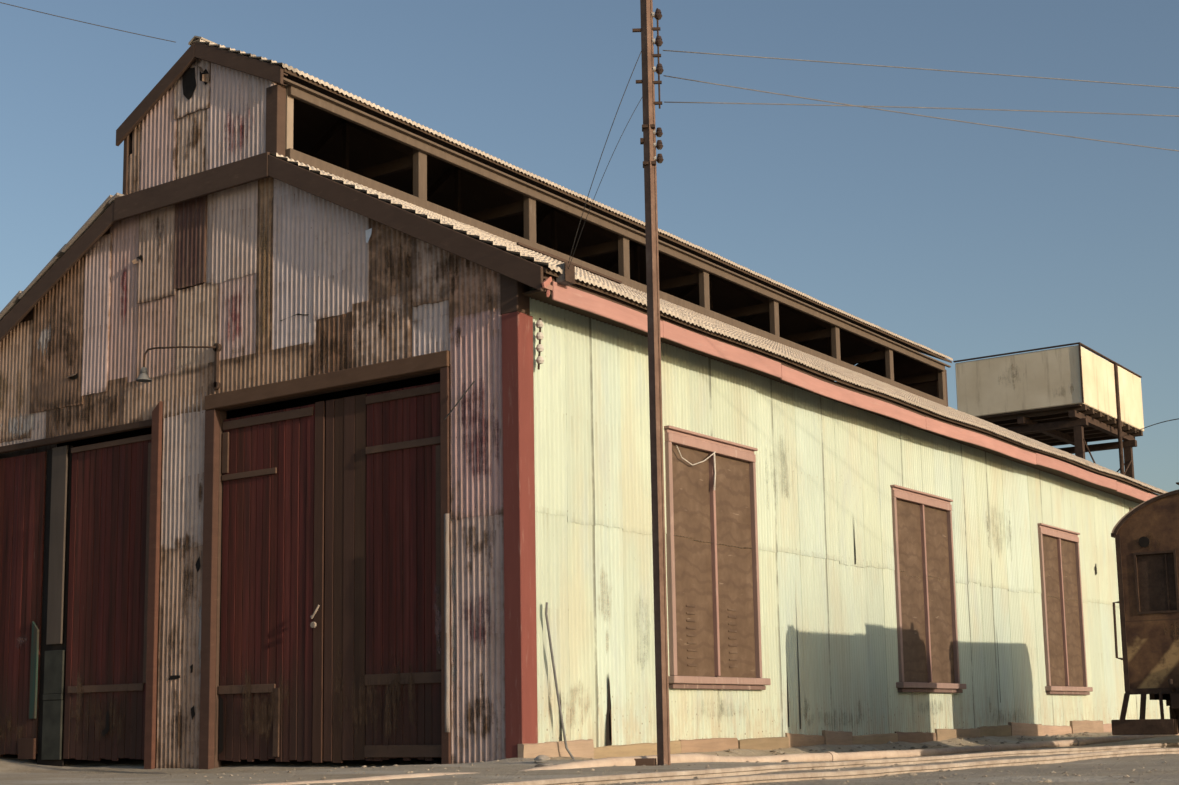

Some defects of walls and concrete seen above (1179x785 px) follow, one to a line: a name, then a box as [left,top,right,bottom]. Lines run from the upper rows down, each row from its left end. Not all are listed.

rust [38,298,78,381]
rust [311,329,361,374]
rust [53,393,116,428]
rust [169,674,187,749]
rust [467,673,498,737]
crack [605,675,613,746]